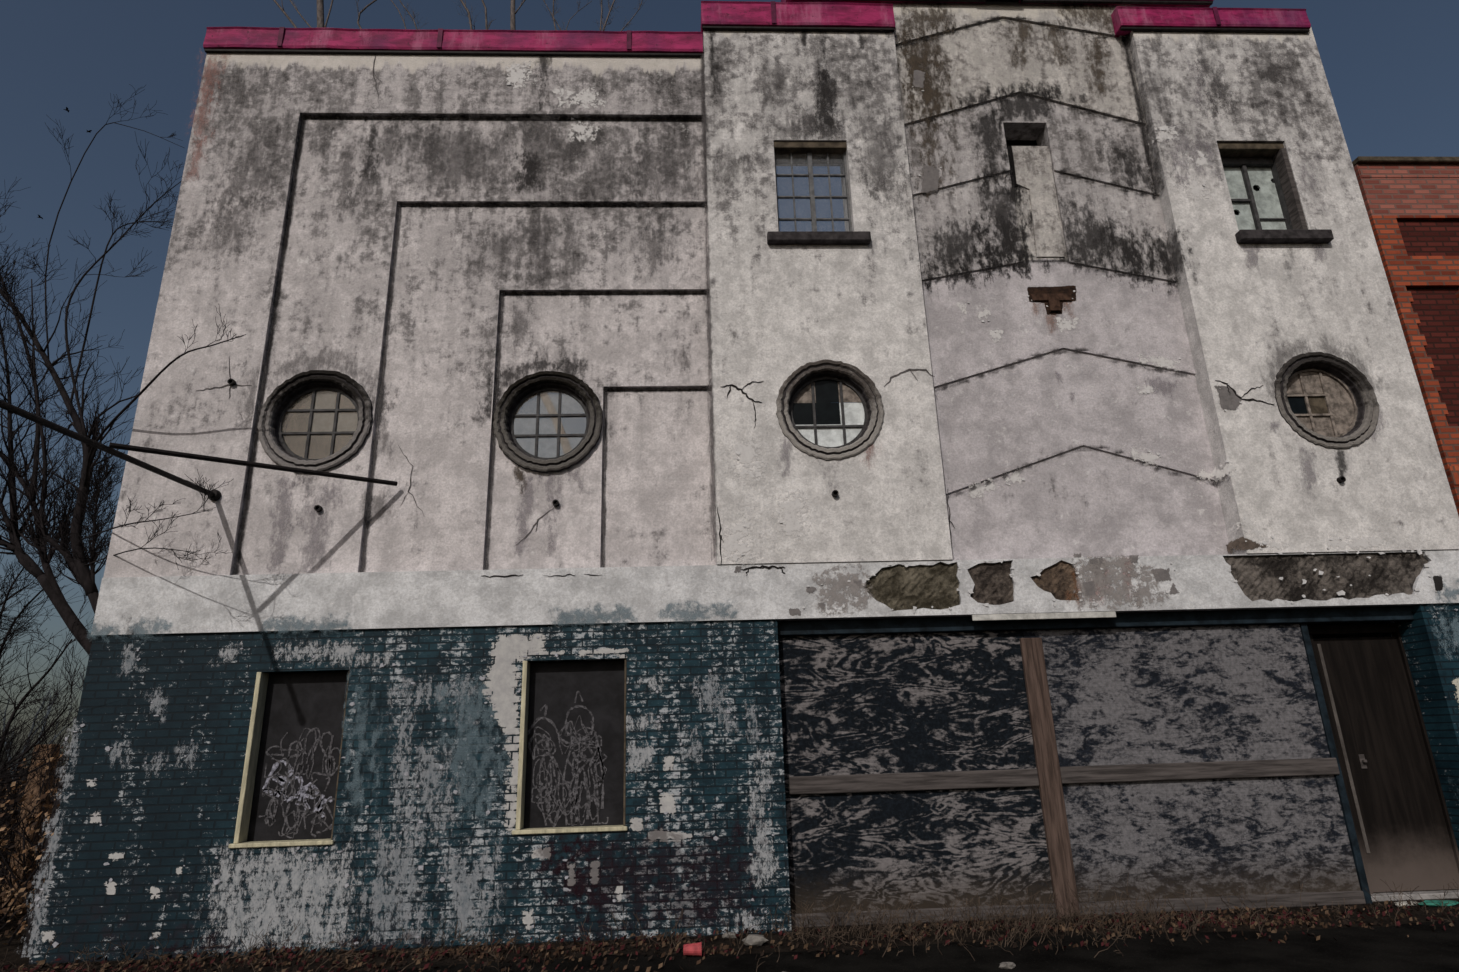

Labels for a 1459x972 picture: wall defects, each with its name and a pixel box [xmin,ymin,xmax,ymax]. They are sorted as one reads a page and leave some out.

damp [895,3,1190,292]
damp [233,30,718,575]
crack [720,381,763,428]
crack [884,368,935,387]
crack [1215,380,1274,405]
spalling [789,553,1180,616]
spalling [1223,537,1459,659]
peeling [193,631,629,953]